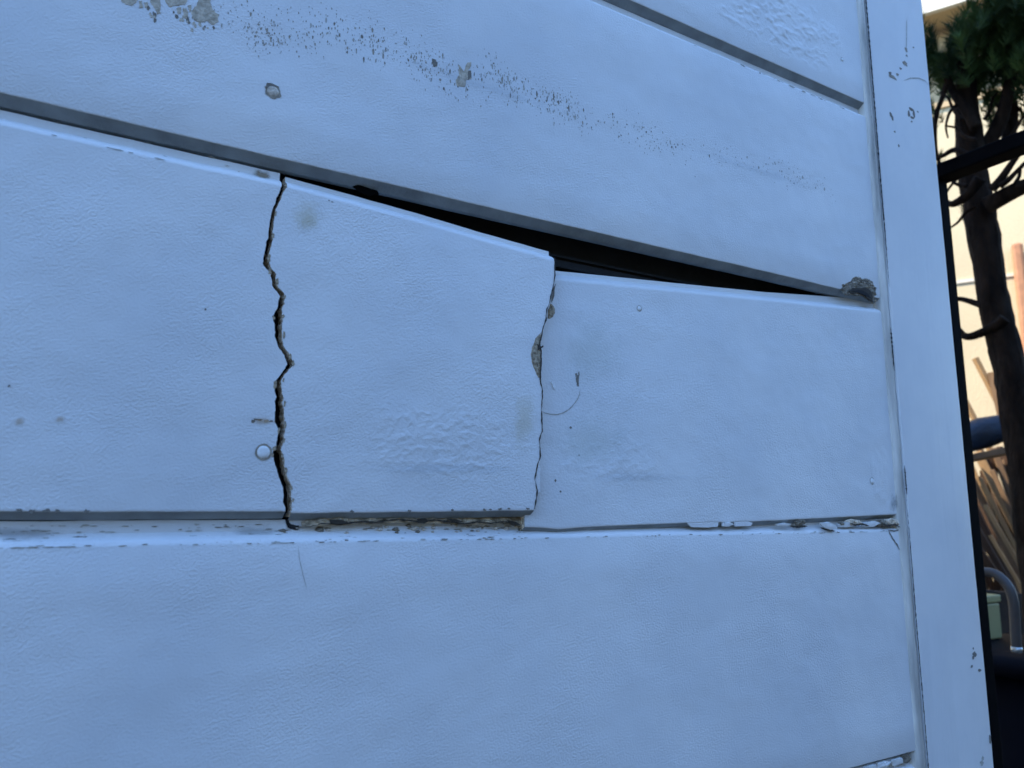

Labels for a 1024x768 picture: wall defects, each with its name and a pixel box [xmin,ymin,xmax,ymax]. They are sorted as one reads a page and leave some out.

peeling [121,0,683,156]
spalling [840,277,877,304]
crack [263,178,307,588]
crack [519,258,580,530]
spalling [272,508,530,543]